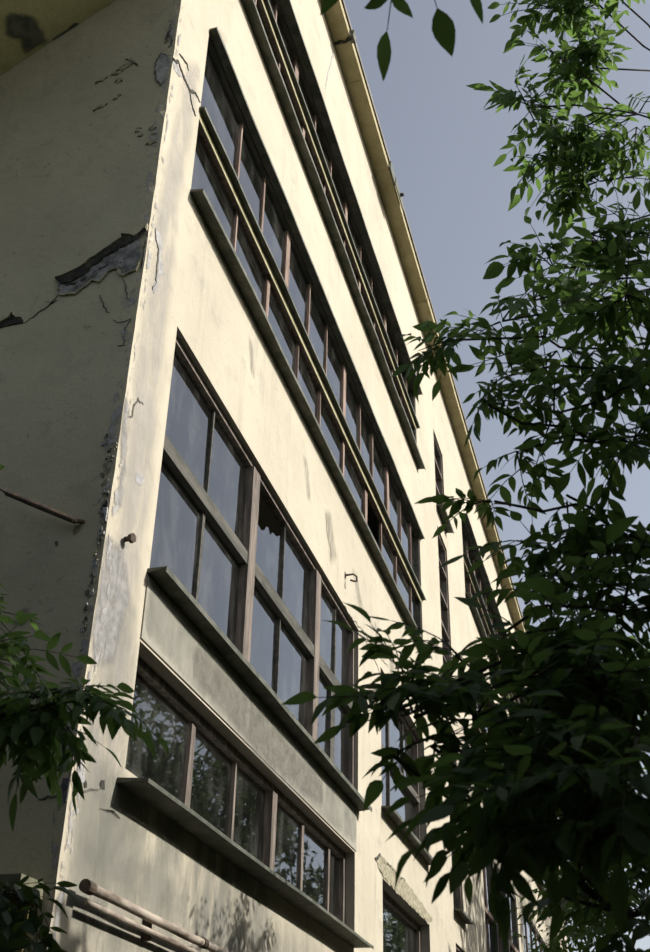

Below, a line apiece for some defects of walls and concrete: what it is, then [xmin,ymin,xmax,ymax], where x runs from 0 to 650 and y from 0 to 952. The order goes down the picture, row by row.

leakage [7,14,78,52]
peeling [93,58,138,112]
crack [154,24,201,116]
spalling [25,223,164,323]
crack [100,278,131,346]
flaking render [79,399,129,663]